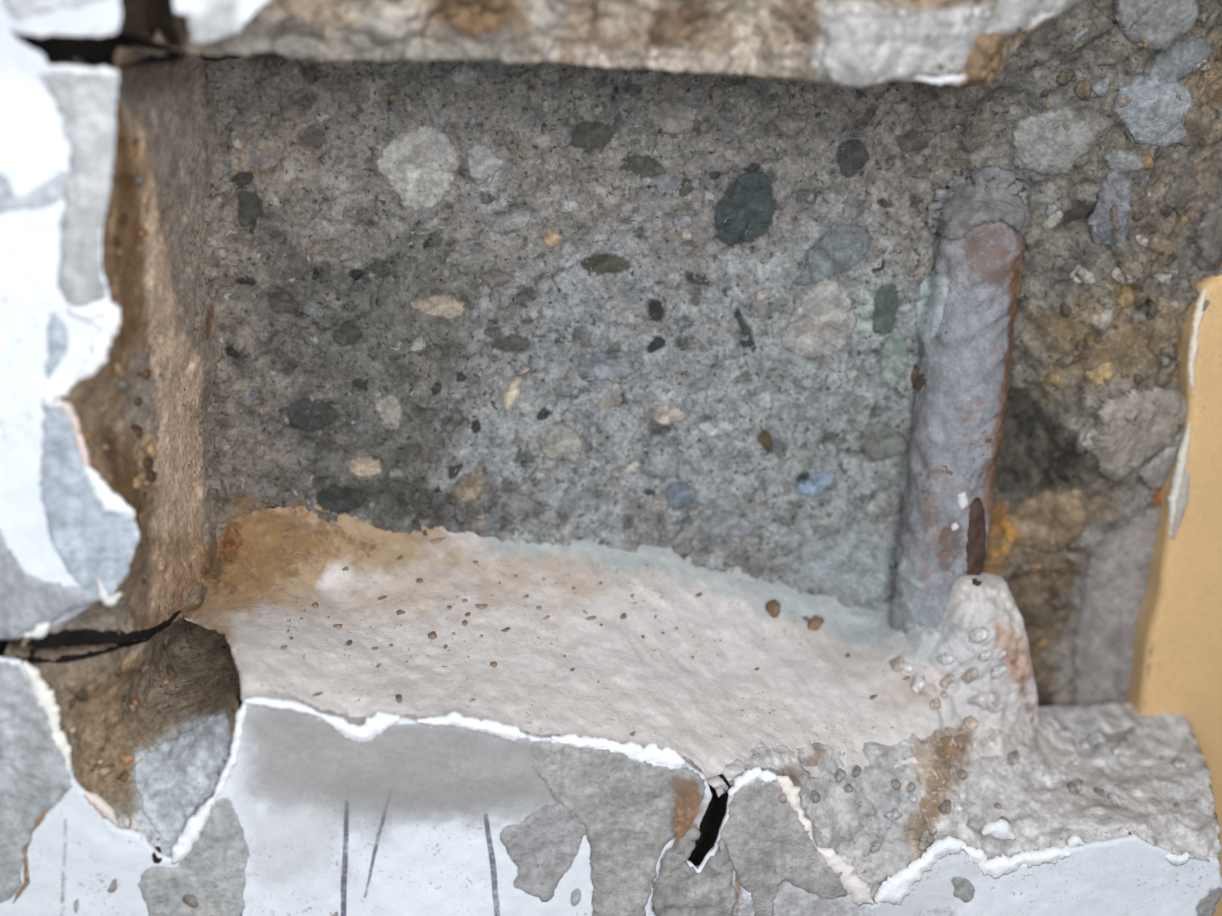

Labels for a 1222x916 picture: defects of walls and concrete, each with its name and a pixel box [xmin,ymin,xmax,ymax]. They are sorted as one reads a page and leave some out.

peeling [12,29,117,37]
leakage [45,312,69,378]
spalling [150,0,1081,610]
corrosion [1005,294,1018,392]
leakage [39,405,138,599]
spalling [4,45,400,865]
spalling [722,0,1222,906]
corrosion [983,502,1014,576]
peeling [417,711,528,742]
peeling [551,733,686,770]